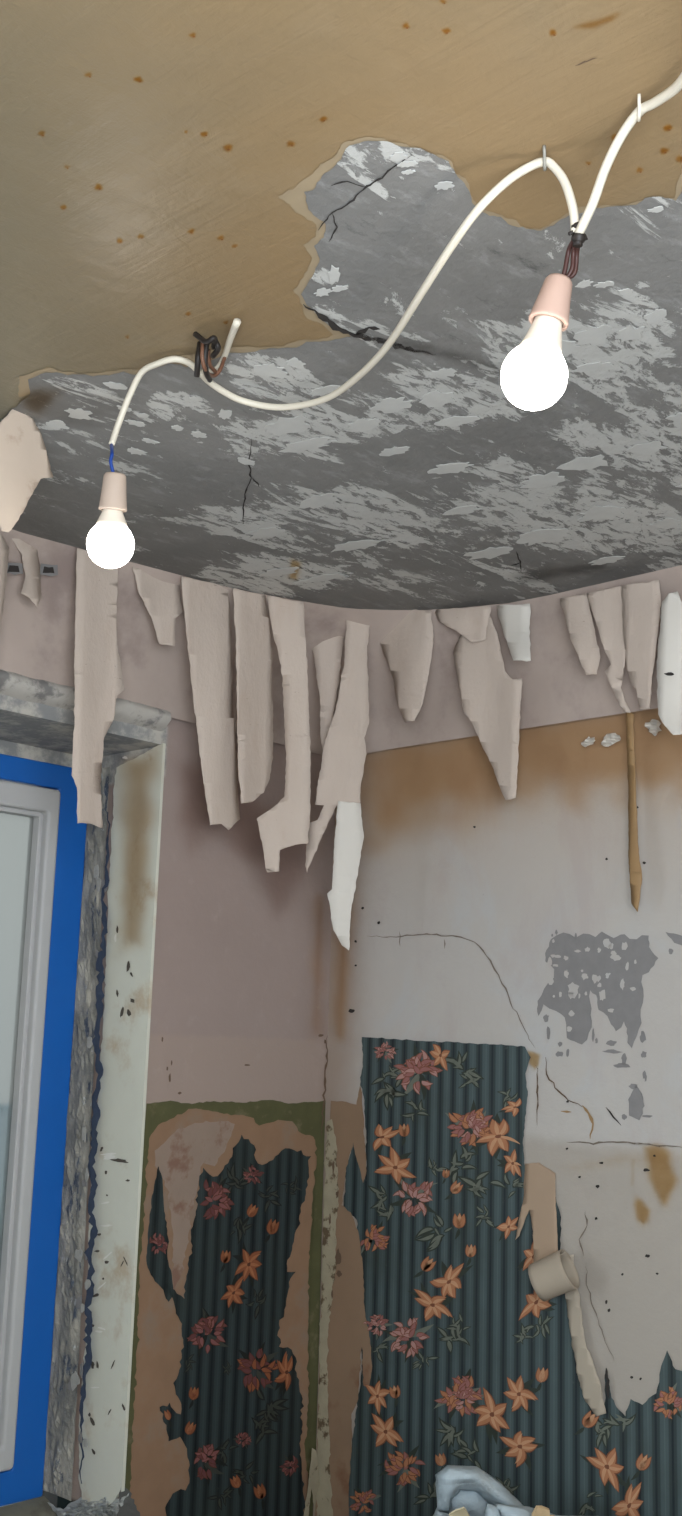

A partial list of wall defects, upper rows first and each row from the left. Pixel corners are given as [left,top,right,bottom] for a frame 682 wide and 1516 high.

crack [319,155,412,241]
peeling [0,137,682,950]
spalling [43,548,128,1501]
crack [370,932,680,1147]
spalling [537,930,682,1120]
spalling [316,1119,342,1516]
peeling [515,1163,580,1301]
spalling [48,1493,129,1516]